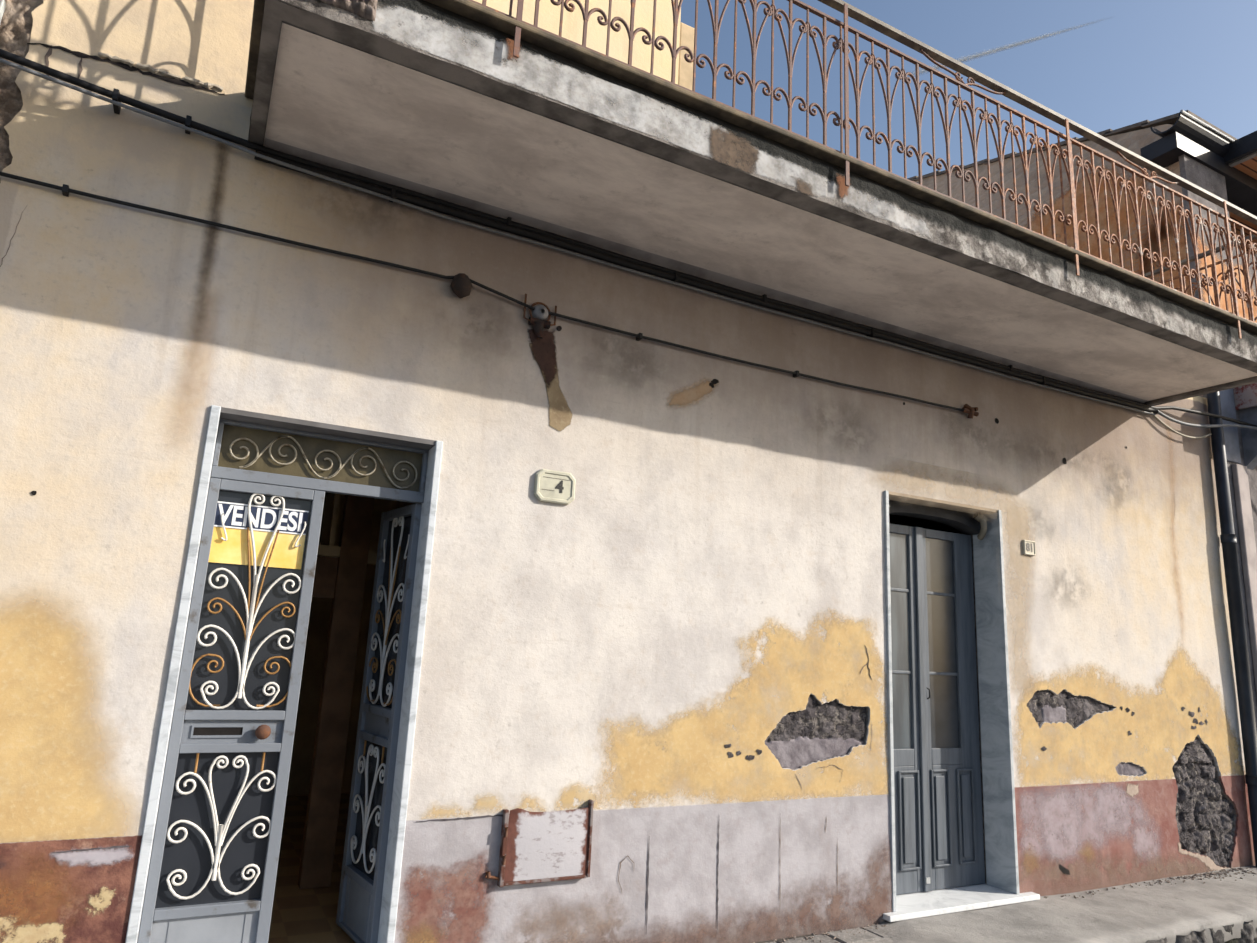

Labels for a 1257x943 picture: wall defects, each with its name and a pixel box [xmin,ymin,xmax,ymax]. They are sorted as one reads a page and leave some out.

crack [27,43,225,95]
leakage [203,144,224,275]
peeling [321,0,930,237]
peeling [0,602,126,843]
peeling [519,611,889,810]
peeling [887,470,1244,875]
leakage [525,848,892,943]